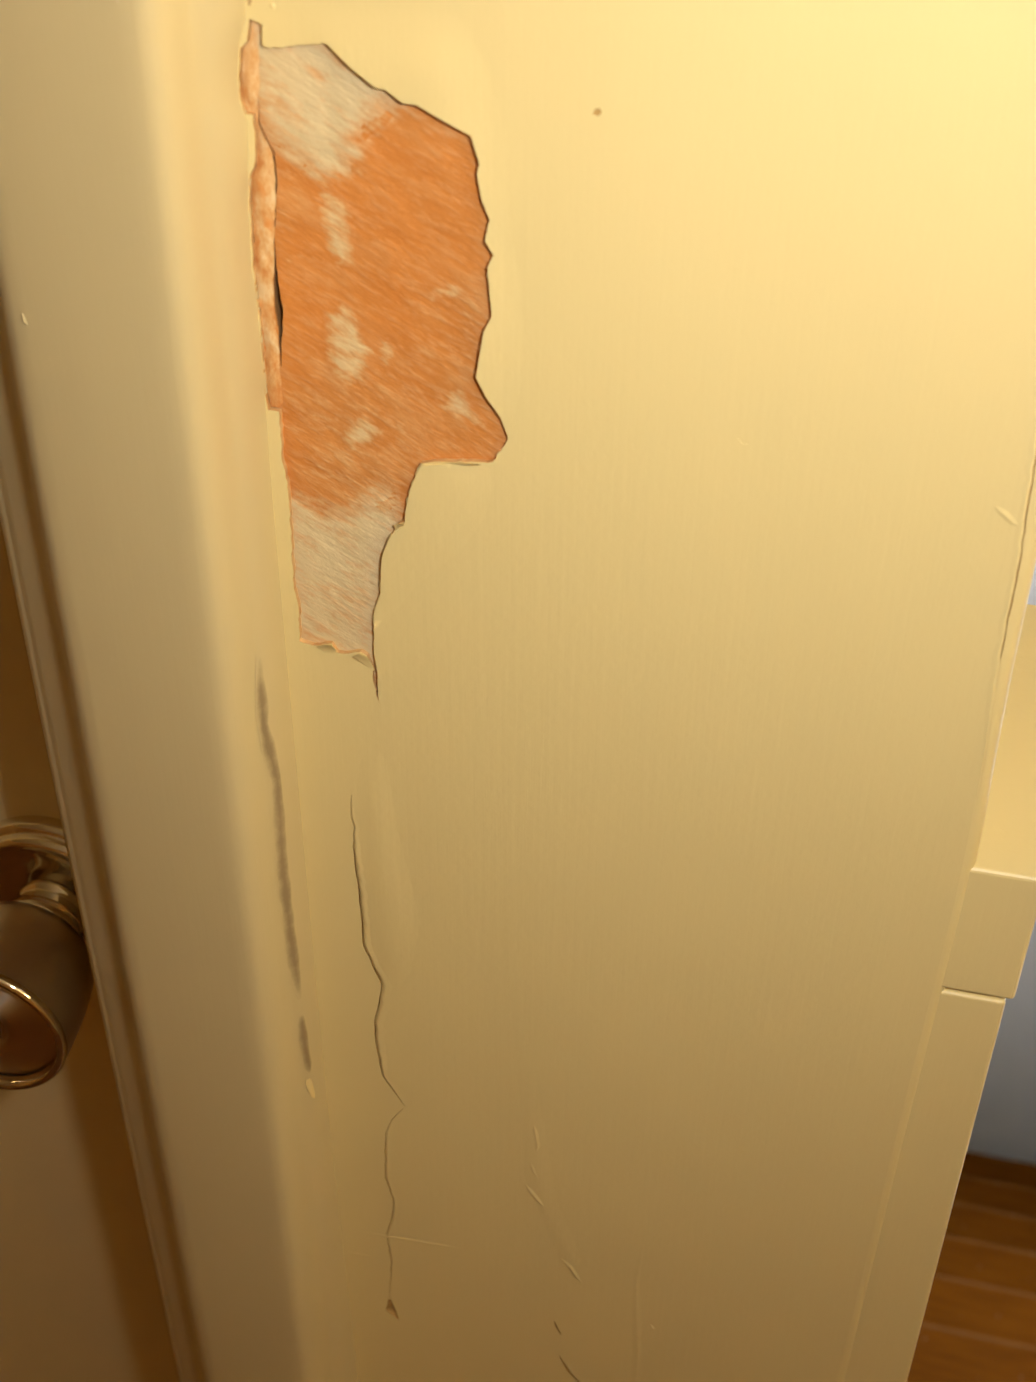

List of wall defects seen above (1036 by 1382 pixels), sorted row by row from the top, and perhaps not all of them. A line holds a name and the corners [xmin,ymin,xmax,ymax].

flaking render [239,19,508,701]
crack [351,795,406,1320]